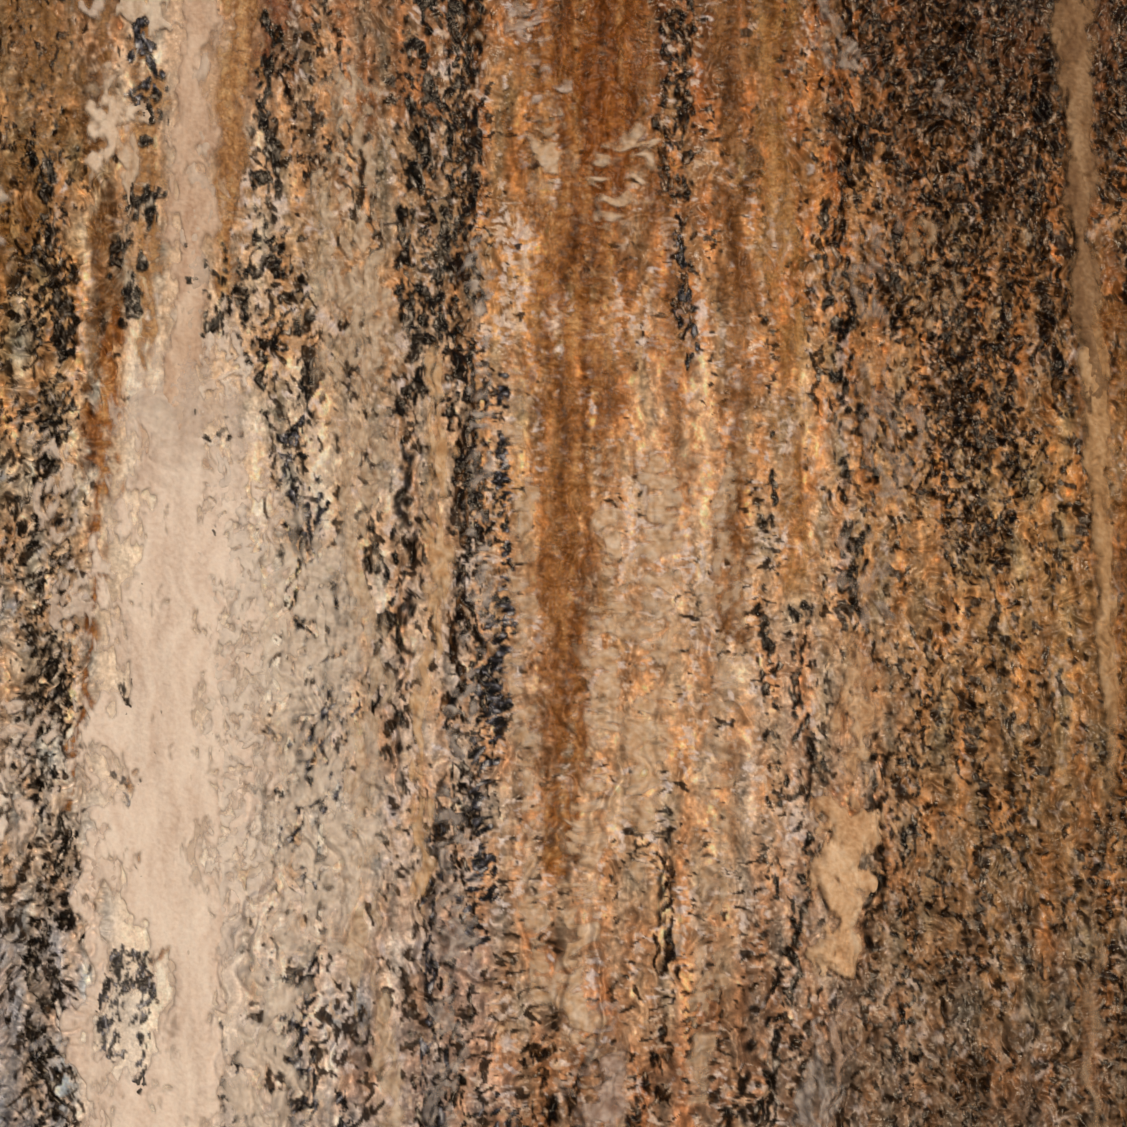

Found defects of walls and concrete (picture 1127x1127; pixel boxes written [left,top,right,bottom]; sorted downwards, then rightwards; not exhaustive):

corrosion [0,0,170,558]
corrosion [65,573,107,811]
leakage [0,0,683,1127]
corrosion [520,0,658,877]
leakage [590,0,701,371]
leakage [687,948,727,1103]
leakage [697,425,841,1127]